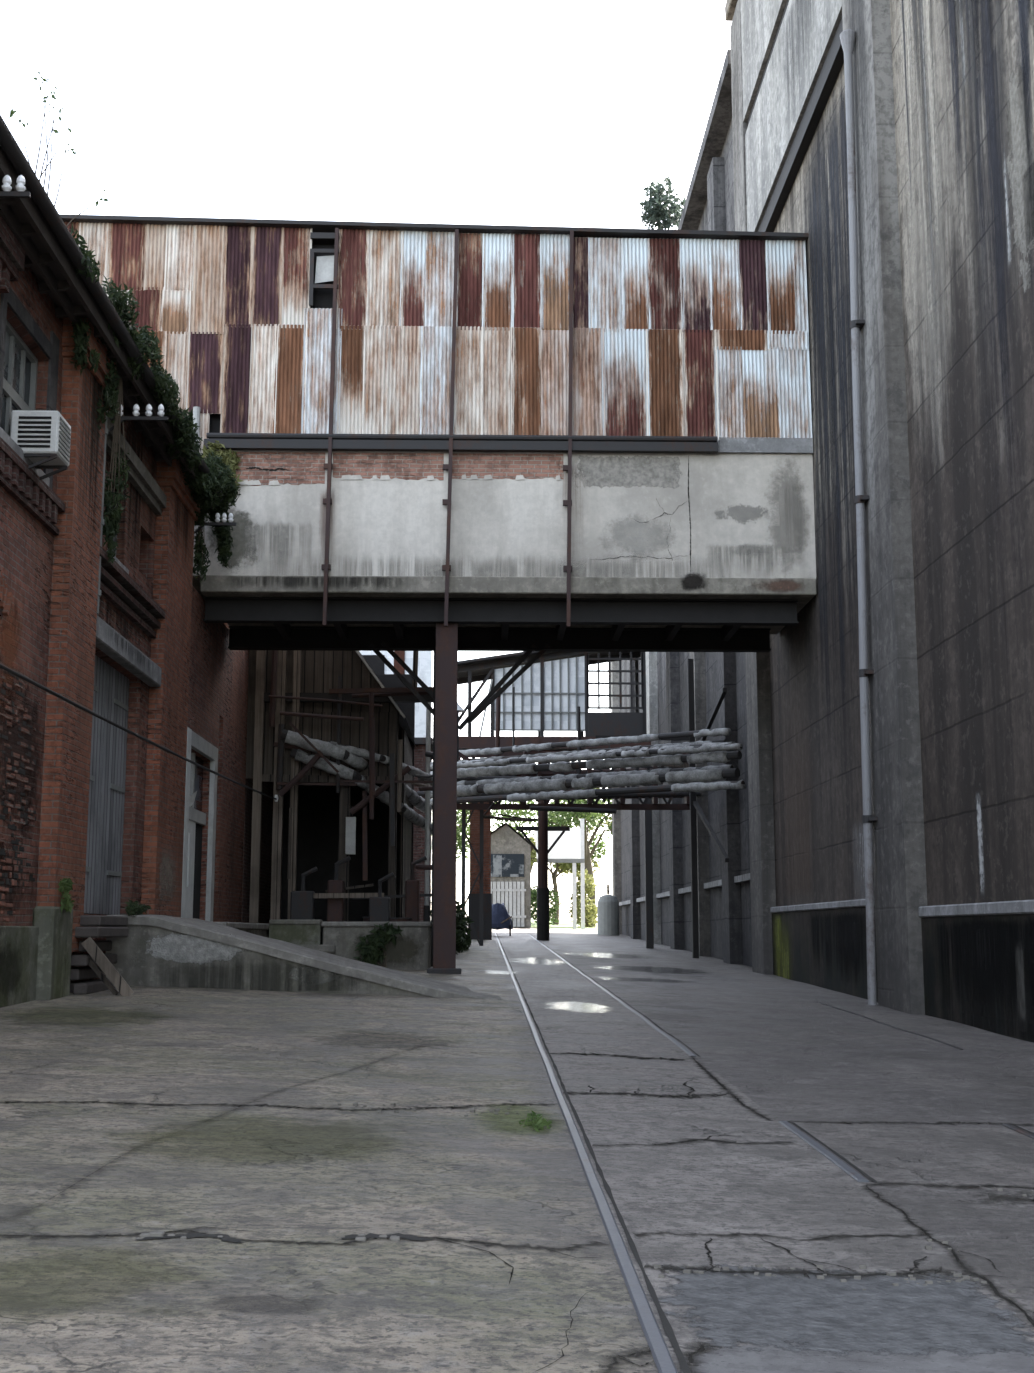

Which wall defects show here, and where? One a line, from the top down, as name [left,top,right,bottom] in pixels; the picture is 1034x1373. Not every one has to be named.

leakage [900,0,1011,345]
leakage [1018,0,1034,231]
rust [64,222,807,438]
leakage [209,511,399,587]
spalling [231,452,681,488]
crack [0,1182,1034,1373]